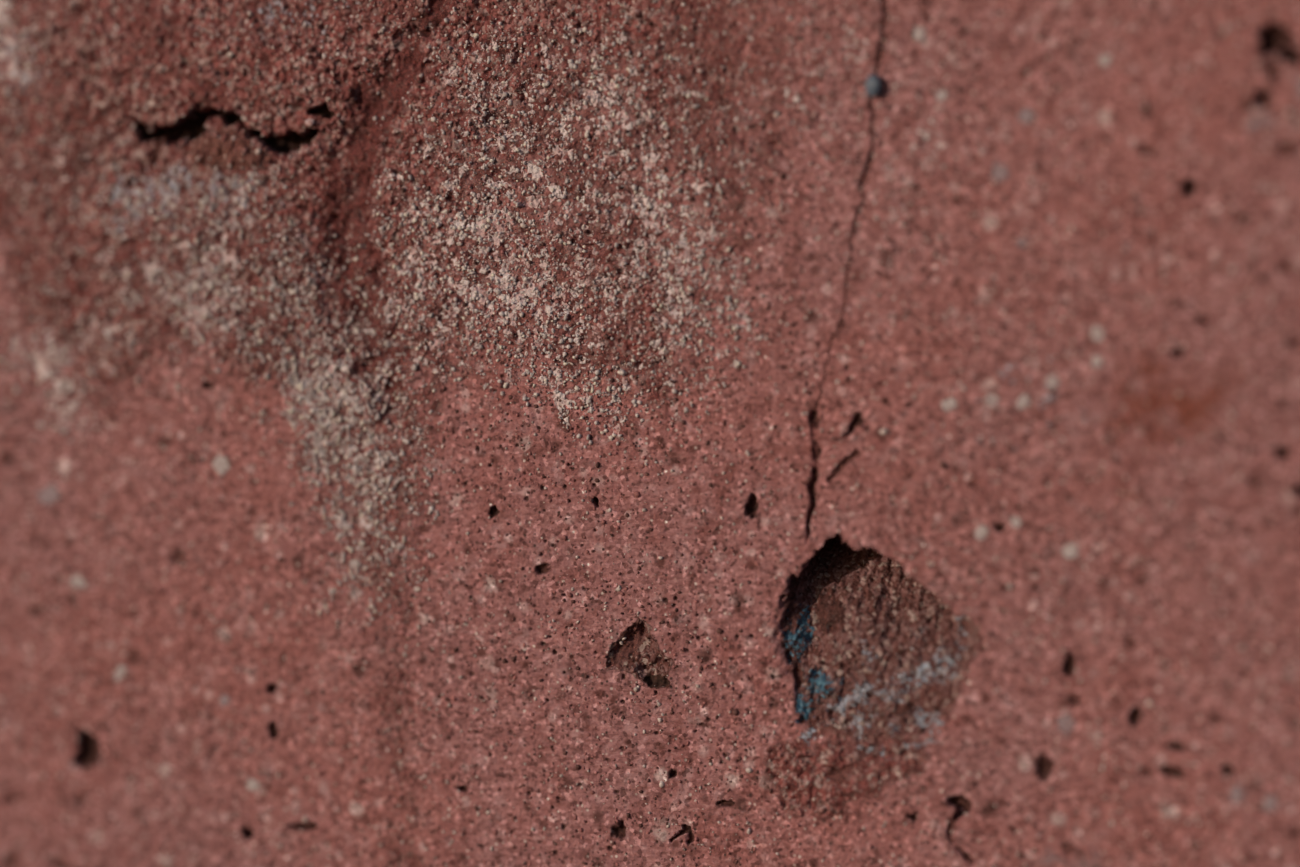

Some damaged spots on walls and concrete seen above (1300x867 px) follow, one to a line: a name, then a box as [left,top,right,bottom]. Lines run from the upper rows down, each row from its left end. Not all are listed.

crack [110,10,447,201]
damp [752,16,875,129]
damp [0,0,781,628]
crack [807,0,890,538]
spalling [606,618,674,689]
spalling [766,533,984,820]